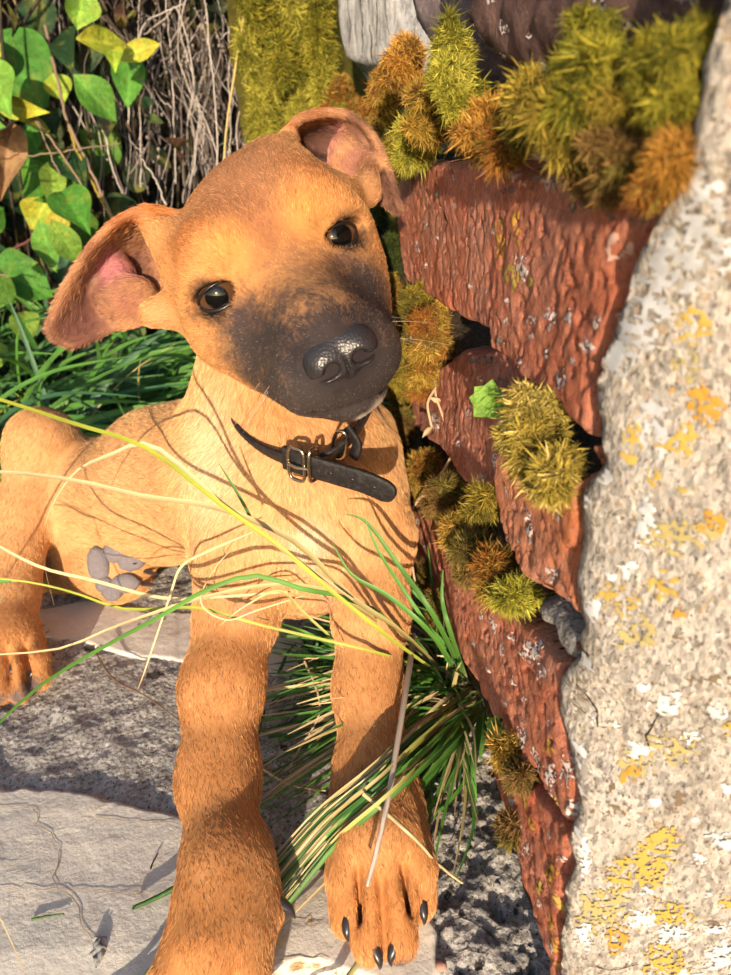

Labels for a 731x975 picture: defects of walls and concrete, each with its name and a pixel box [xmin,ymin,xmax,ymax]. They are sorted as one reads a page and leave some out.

spalling [121,720,149,733]
crack [0,806,145,939]